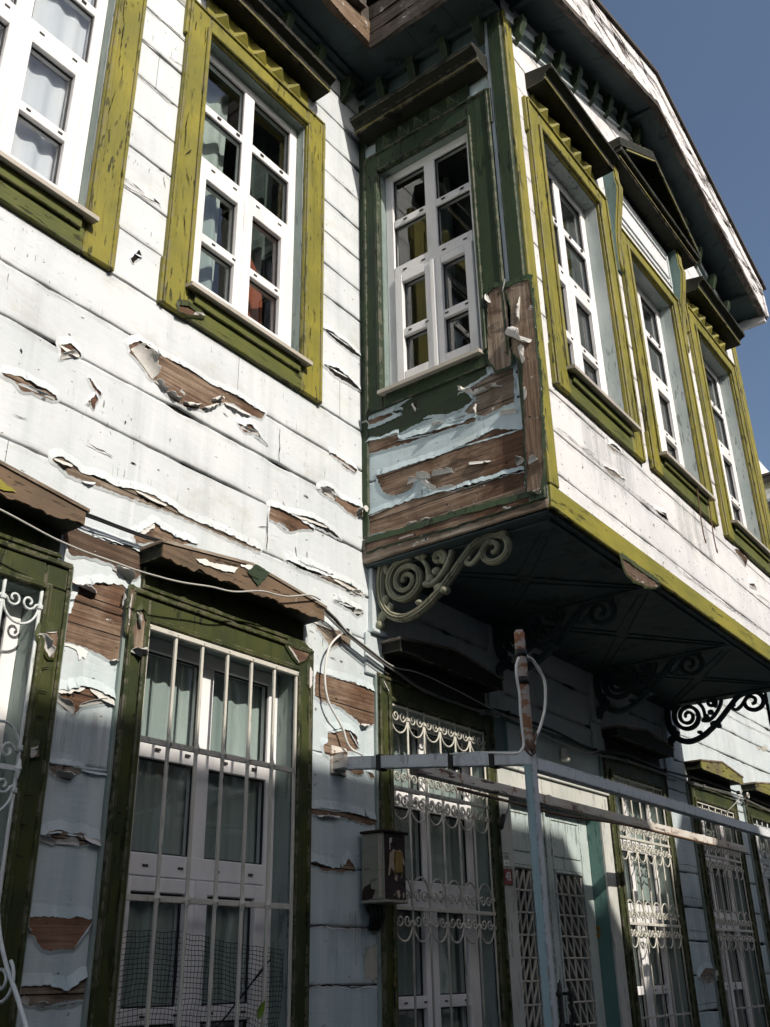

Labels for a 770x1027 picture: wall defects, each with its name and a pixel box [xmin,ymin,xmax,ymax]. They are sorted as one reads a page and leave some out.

peeling [55,336,84,362]
peeling [0,364,61,403]
peeling [124,334,269,447]
peeling [316,274,547,554]
peeling [266,499,342,541]
peeling [34,448,270,665]
peeling [284,551,365,618]
peeling [311,617,352,651]
peeling [285,638,393,760]
peeling [347,770,375,780]
peeling [39,819,101,849]
peeling [27,903,93,956]